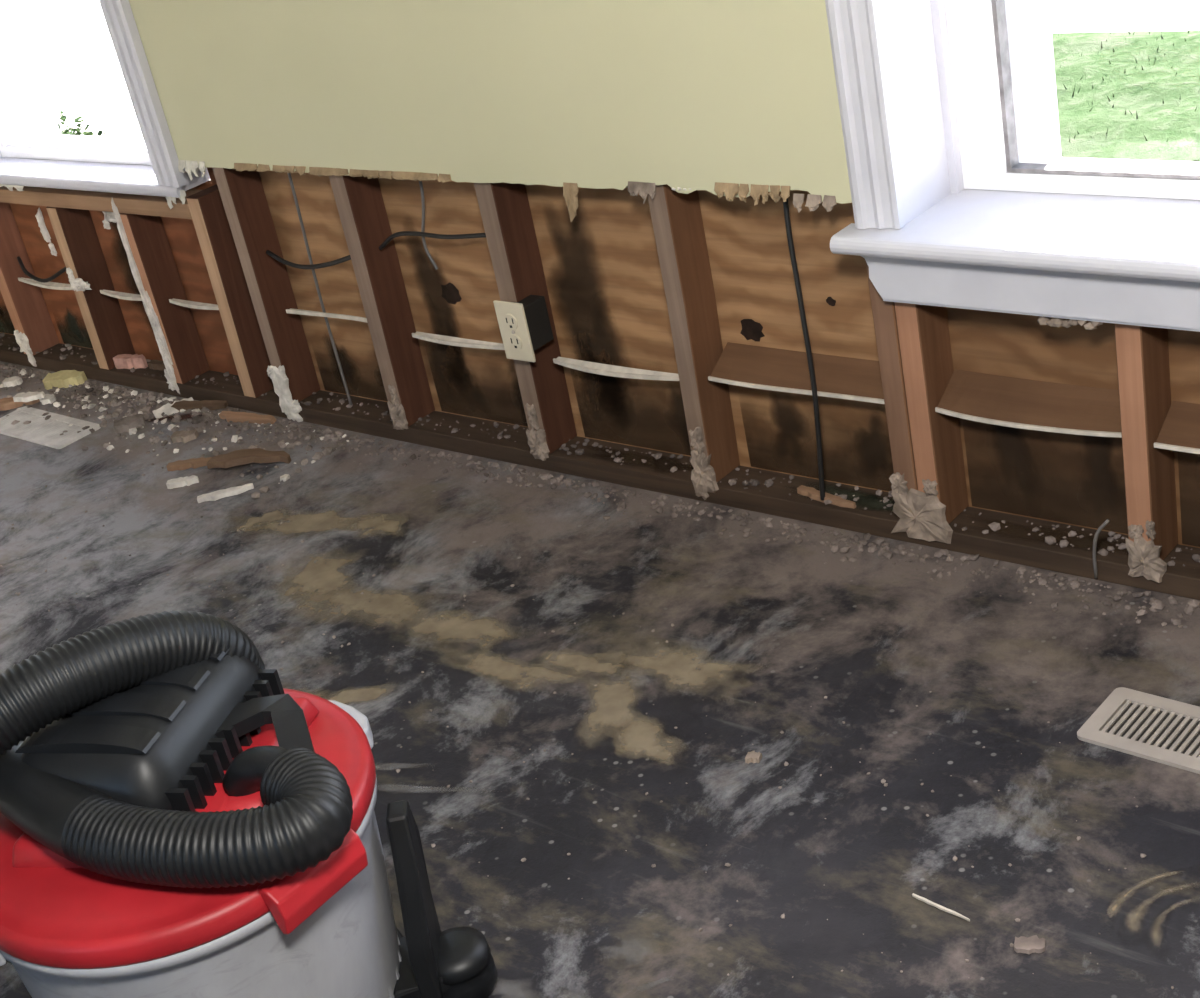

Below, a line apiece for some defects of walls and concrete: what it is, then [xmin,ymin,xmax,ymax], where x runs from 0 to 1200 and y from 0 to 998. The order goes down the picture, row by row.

peeling [245,163,451,183]
peeling [724,183,790,206]
flaking render [35,208,57,256]
flaking render [66,267,92,291]
flaking render [102,198,180,394]
flaking render [14,330,37,367]
water stain [413,242,528,426]
water stain [553,223,694,471]
flaking render [267,366,303,422]
flaking render [689,427,719,500]
flaking render [889,472,953,544]
flaking render [1126,520,1167,583]